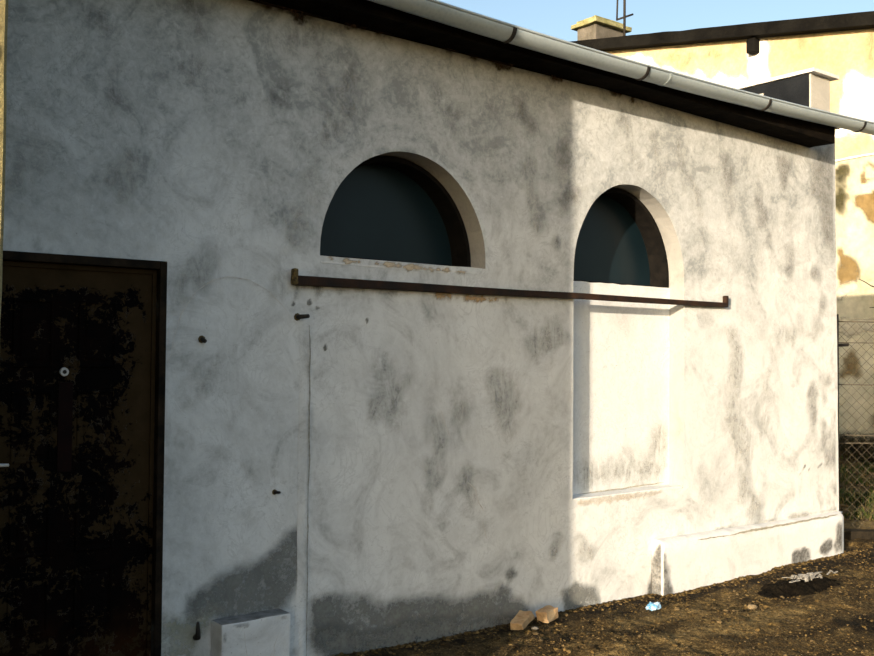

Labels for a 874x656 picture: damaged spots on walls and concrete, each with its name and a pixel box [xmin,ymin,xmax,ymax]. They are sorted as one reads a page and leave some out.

flaking render [254,0,319,25]
flaking render [470,54,513,71]
flaking render [624,40,770,87]
flaking render [840,72,874,122]
flaking render [855,191,874,223]
flaking render [837,249,859,300]
water stain [161,531,297,656]
water stain [311,571,529,655]
water stain [648,545,672,596]
water stain [792,548,809,563]
water stain [820,525,842,554]